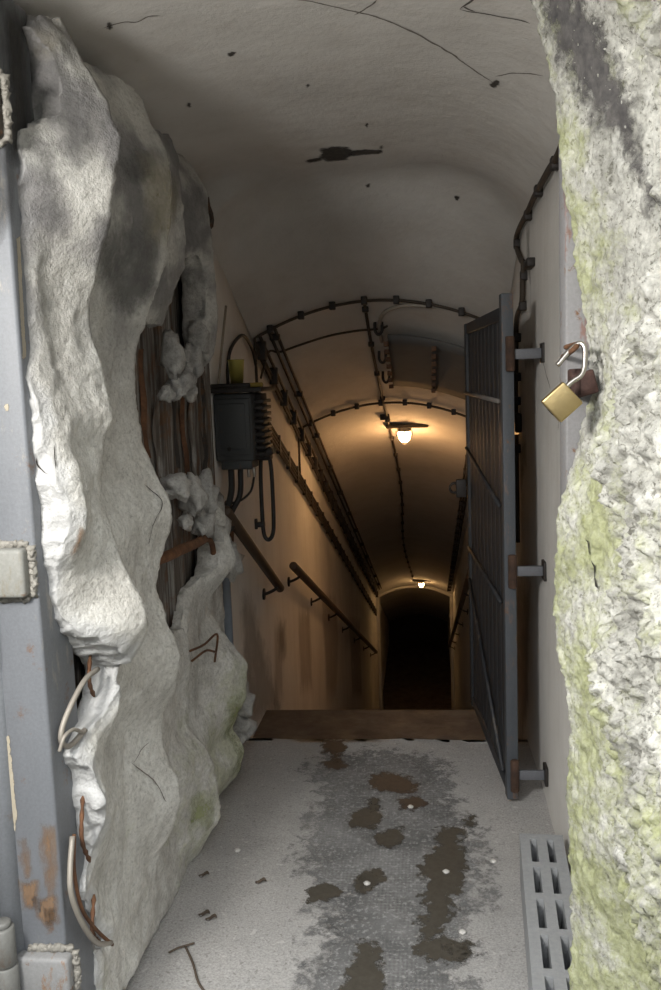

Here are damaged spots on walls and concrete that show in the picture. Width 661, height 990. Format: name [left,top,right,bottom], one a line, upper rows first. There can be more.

crack [301,0,542,83]
corrosion [87,655,95,697]
water stain [320,739,349,770]
corrosion [79,796,91,863]
water stain [345,771,429,849]
corrosion [22,830,57,924]
corrosion [90,894,101,941]
water stain [304,867,387,904]
water stain [411,814,479,966]
water stain [338,938,391,990]